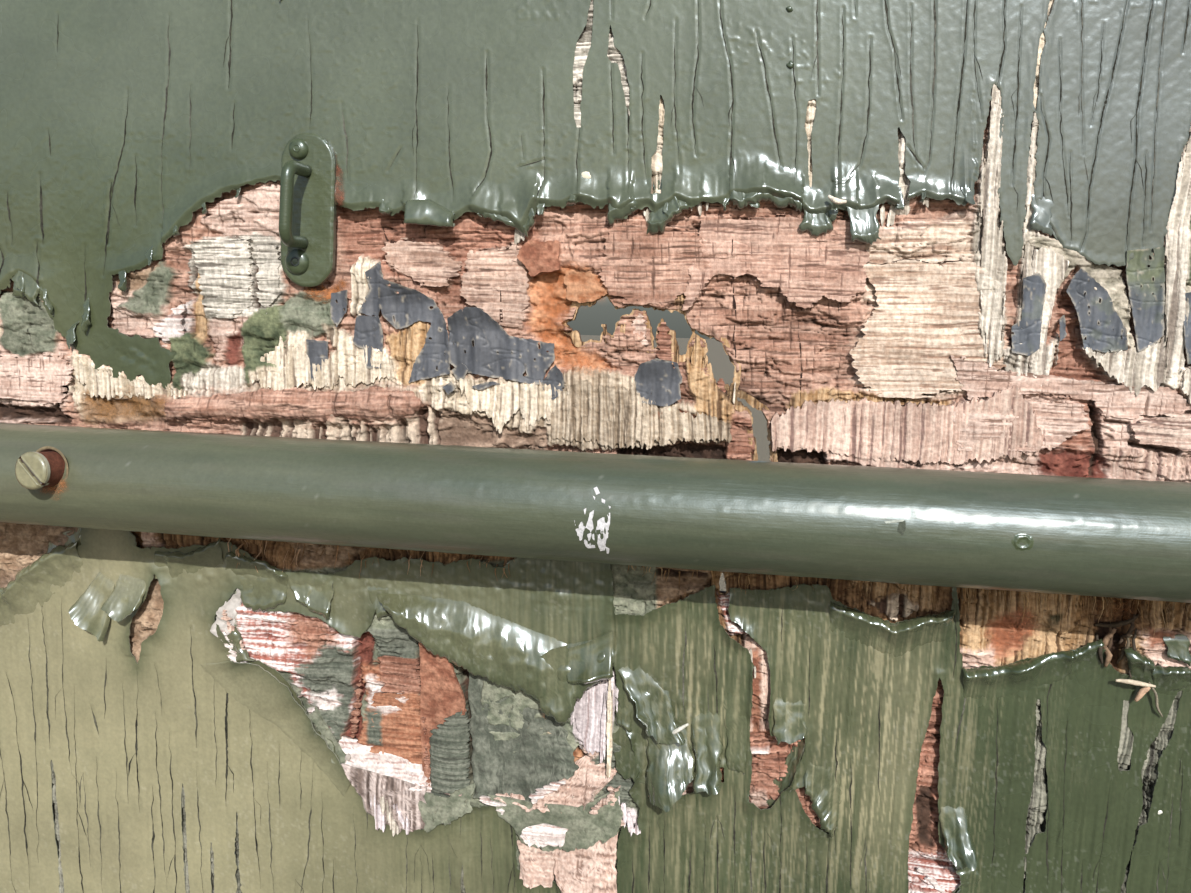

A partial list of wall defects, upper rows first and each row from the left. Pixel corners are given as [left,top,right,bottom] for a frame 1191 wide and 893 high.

crack [447,59,492,196]
crack [611,1,735,190]
crack [756,0,1190,248]
peeling [0,84,1191,482]
crack [868,258,962,266]
peeling [0,522,83,627]
peeling [574,487,1191,701]
crack [0,604,368,893]
peeling [69,531,747,893]
crack [632,704,880,893]
peeling [939,806,981,893]
crack [992,684,1183,893]